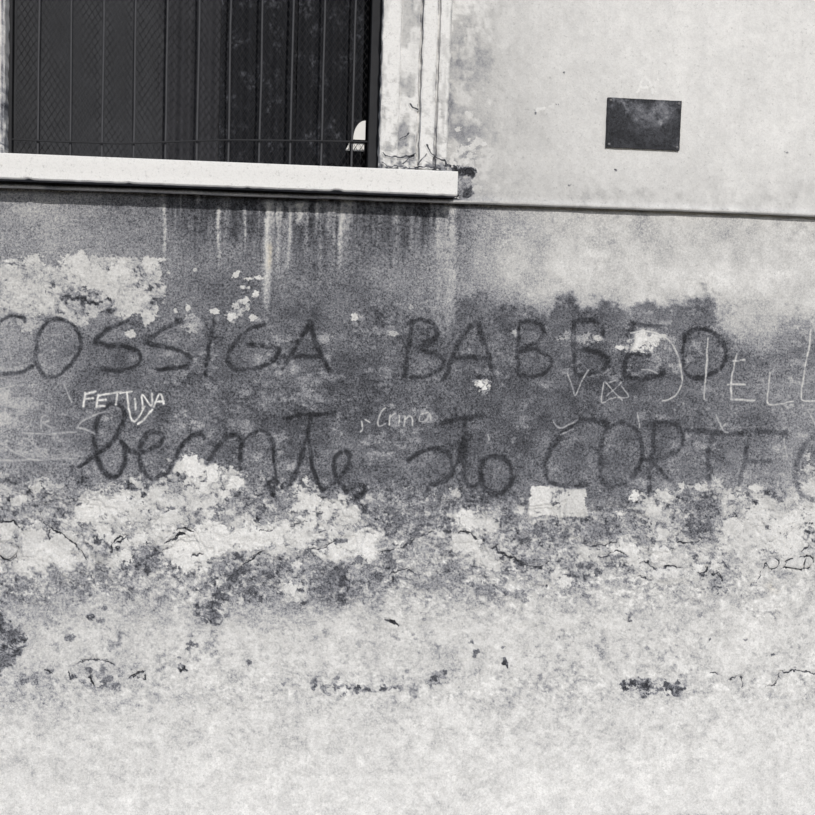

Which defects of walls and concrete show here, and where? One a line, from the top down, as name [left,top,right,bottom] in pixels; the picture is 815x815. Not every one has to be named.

peeling [447,110,492,199]
peeling [0,248,265,338]
damp [0,188,815,511]
peeling [0,447,815,679]
spalling [306,674,406,701]
spalling [421,664,454,693]
spalling [615,673,691,704]
crack [709,671,743,688]
crack [765,669,815,689]